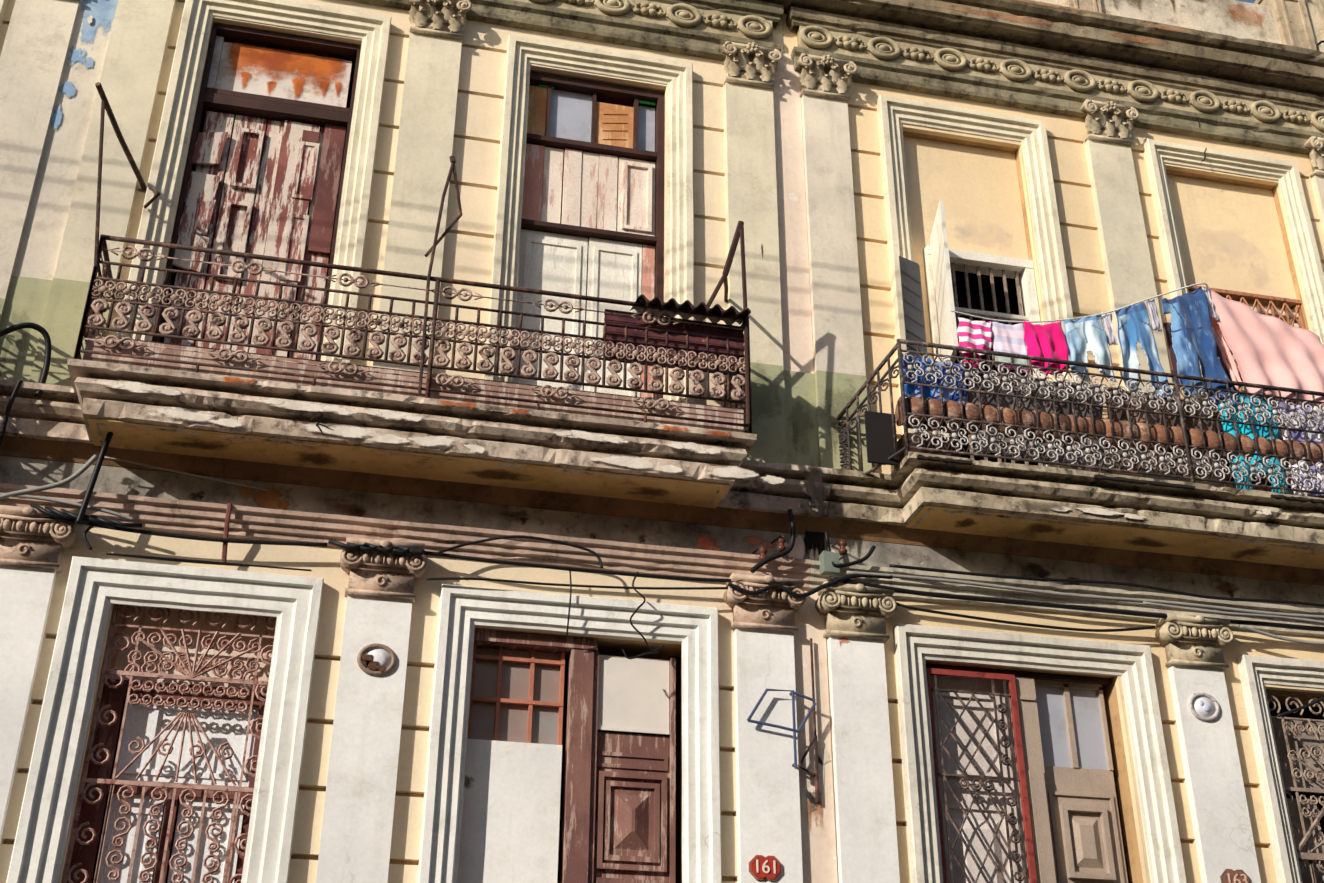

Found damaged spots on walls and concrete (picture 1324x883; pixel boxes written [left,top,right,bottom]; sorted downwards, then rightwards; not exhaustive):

peeling [69,0,118,68]
leakage [1229,4,1261,26]
peeling [51,82,76,130]
spalling [100,381,242,427]
spalling [261,398,485,453]